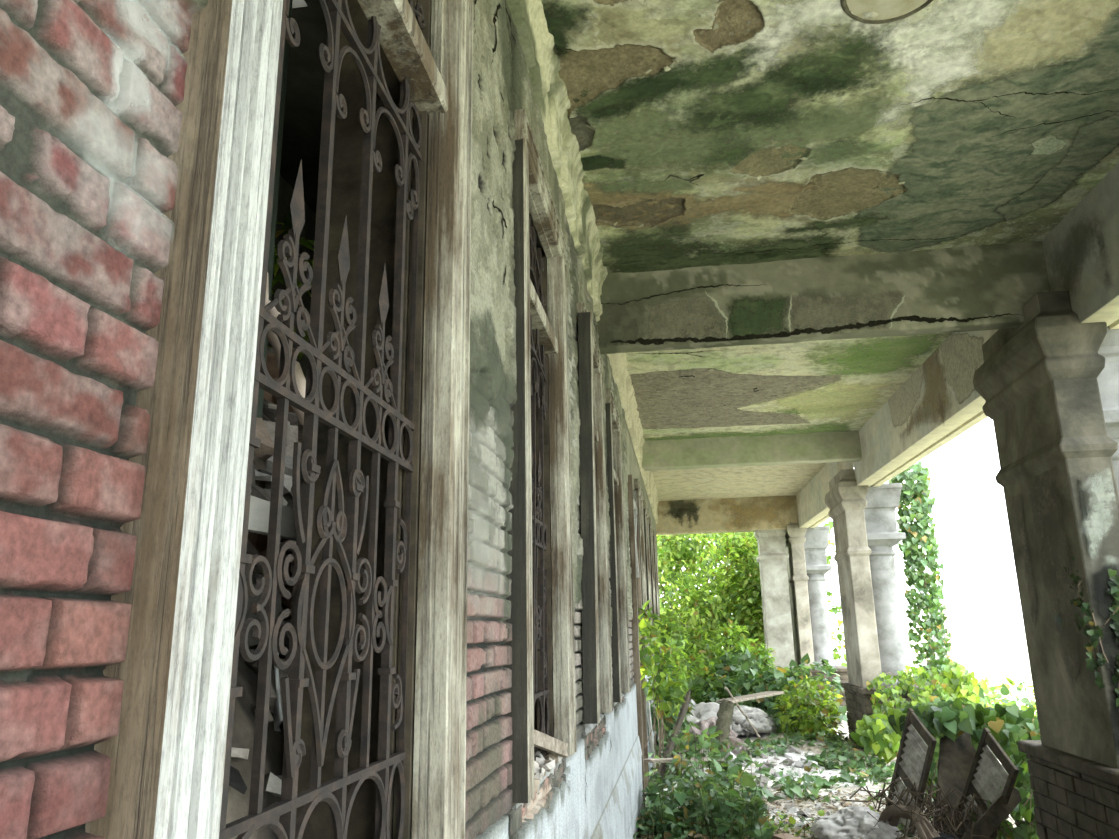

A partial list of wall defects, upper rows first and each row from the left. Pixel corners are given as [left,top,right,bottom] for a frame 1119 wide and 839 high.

crack [474,0,516,64]
water stain [541,0,591,56]
peeling [694,0,764,53]
peeling [553,44,682,118]
peeling [592,198,685,227]
peeling [731,144,812,181]
water stain [573,0,1119,273]
peeling [788,167,907,220]
crack [901,90,1119,137]
crack [601,284,1020,357]
water stain [1013,470,1079,681]
water stain [1078,471,1119,752]